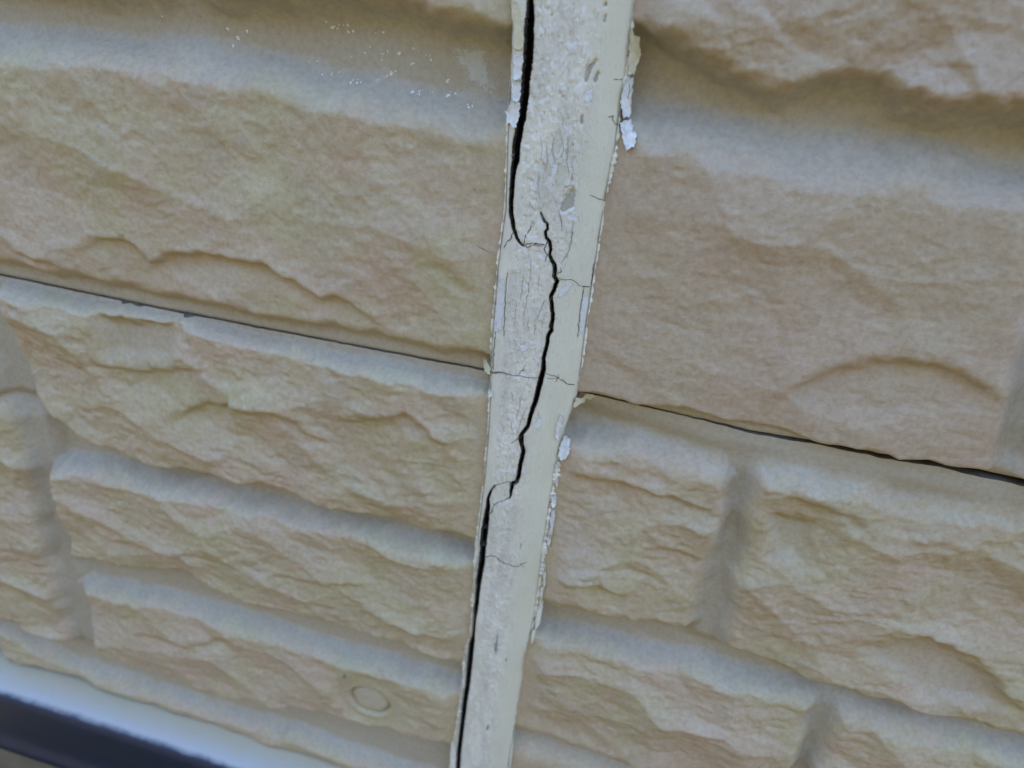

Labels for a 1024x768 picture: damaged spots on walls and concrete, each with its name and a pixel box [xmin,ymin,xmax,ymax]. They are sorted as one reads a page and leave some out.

peeling [490,0,525,359]
spalling [561,190,575,211]
peeling [579,17,641,374]
crack [456,0,606,768]
peeling [531,413,570,644]